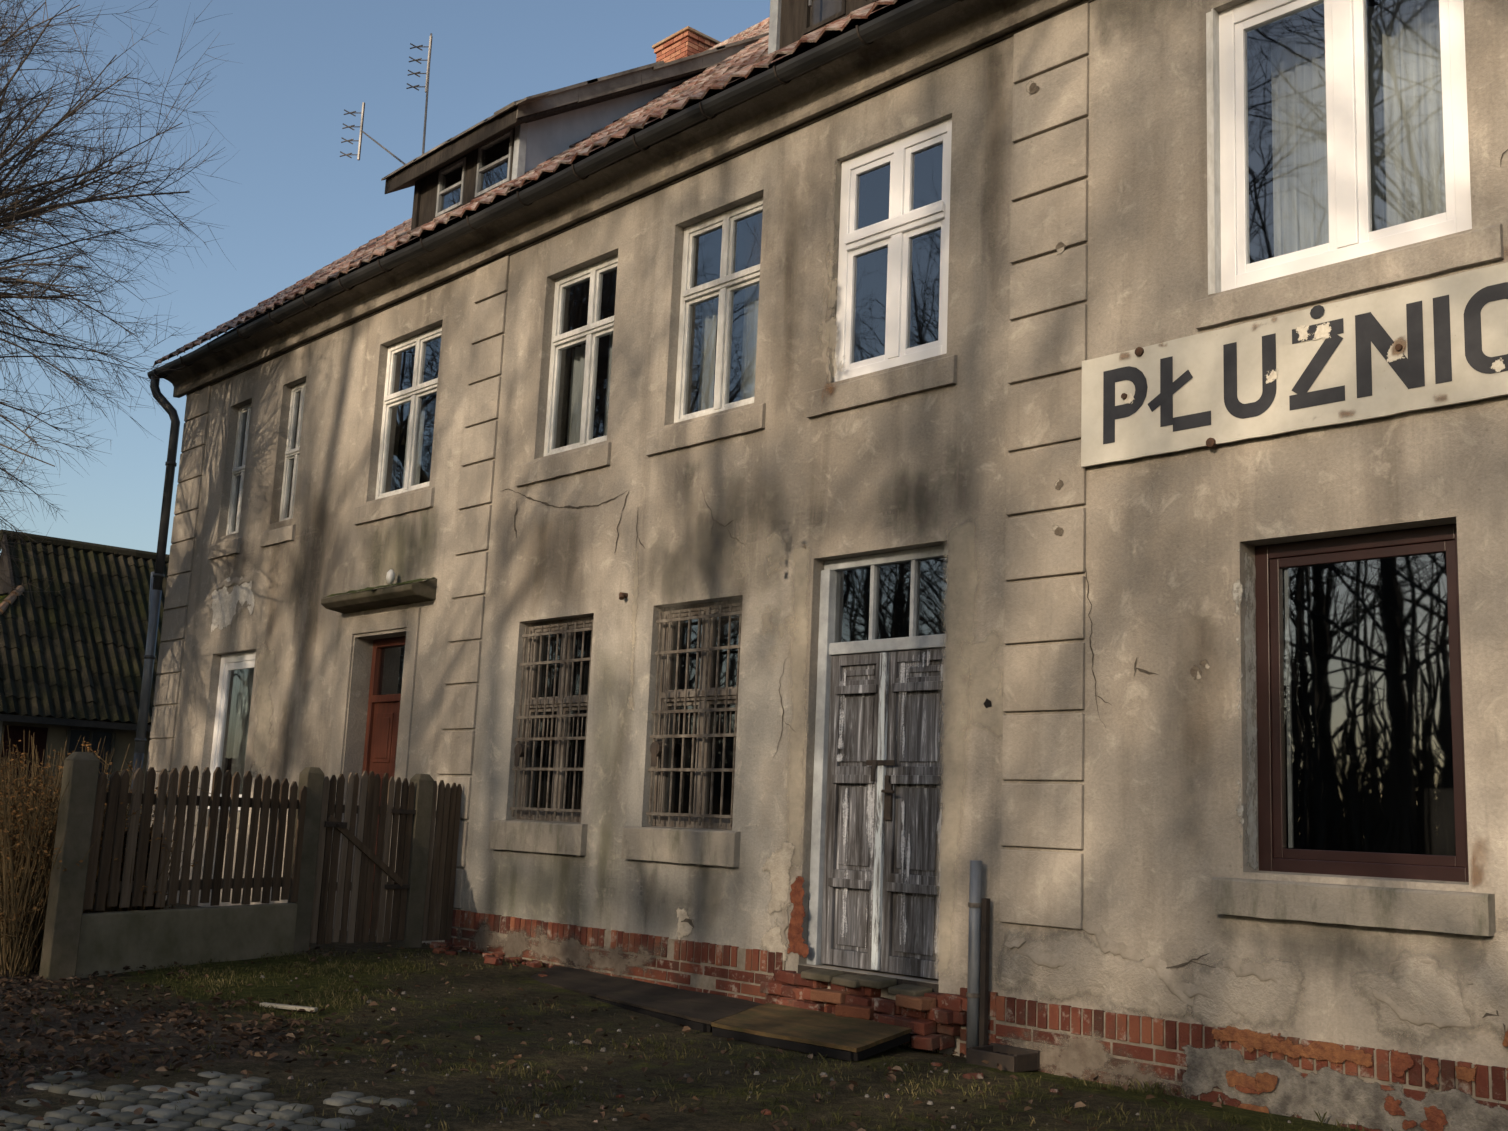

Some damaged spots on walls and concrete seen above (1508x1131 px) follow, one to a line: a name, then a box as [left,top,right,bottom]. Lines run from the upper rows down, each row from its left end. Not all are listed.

crack [503,489,645,554]
flaking render [211,576,255,633]
flaking render [676,907,694,940]
flaking render [760,842,809,962]
flaking render [1212,1026,1477,1085]
flaking render [1226,1070,1278,1113]
flaking render [1384,1094,1448,1131]